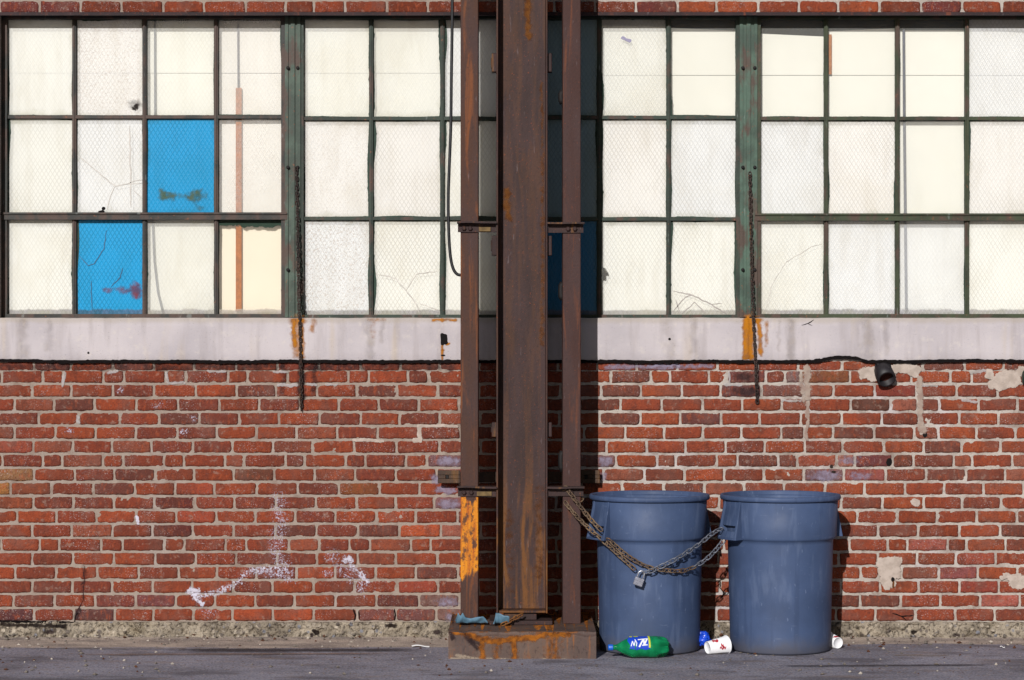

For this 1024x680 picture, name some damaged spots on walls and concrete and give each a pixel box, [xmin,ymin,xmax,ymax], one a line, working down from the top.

corrosion [291,318,313,358]
corrosion [742,315,768,361]
peeling [907,364,938,387]
corrosion [451,611,571,659]